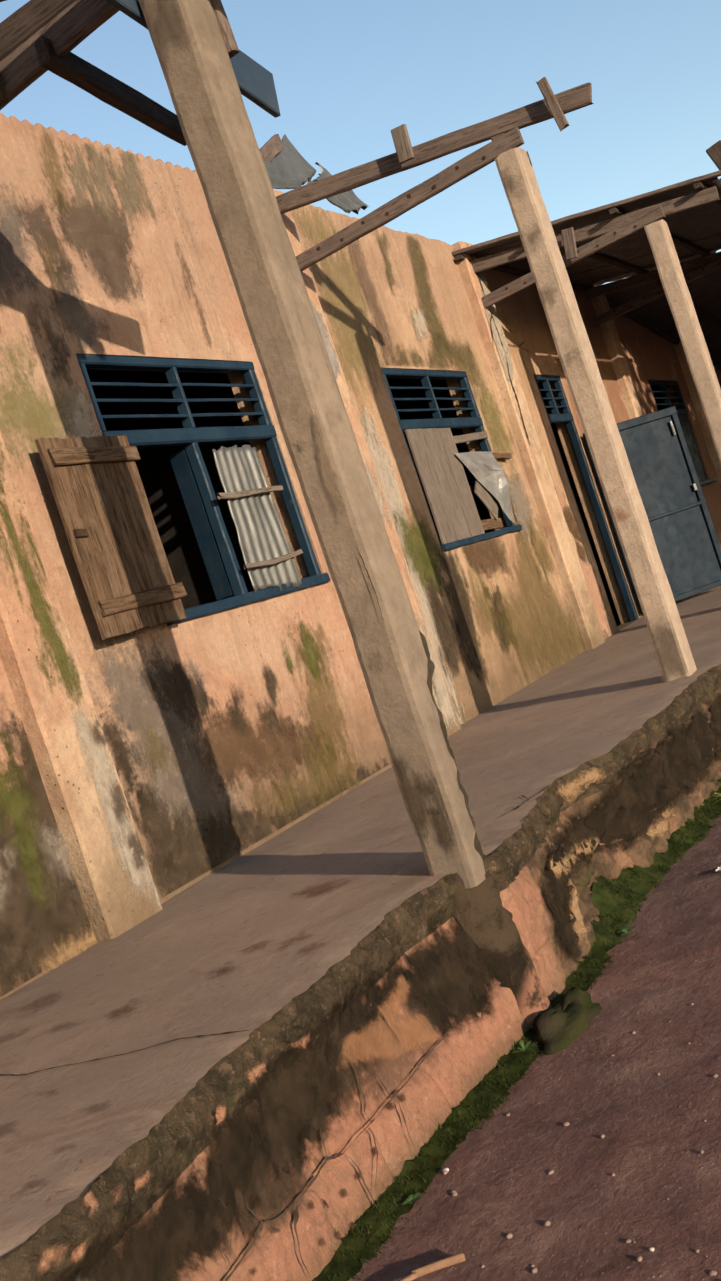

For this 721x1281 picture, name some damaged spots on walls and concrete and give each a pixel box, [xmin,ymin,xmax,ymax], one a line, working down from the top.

damp [0,144,155,380]
damp [350,234,395,364]
damp [0,503,82,704]
damp [426,538,514,683]
damp [0,713,92,997]
damp [93,633,454,896]
crack [0,1029,254,1076]
damp [58,919,499,1281]